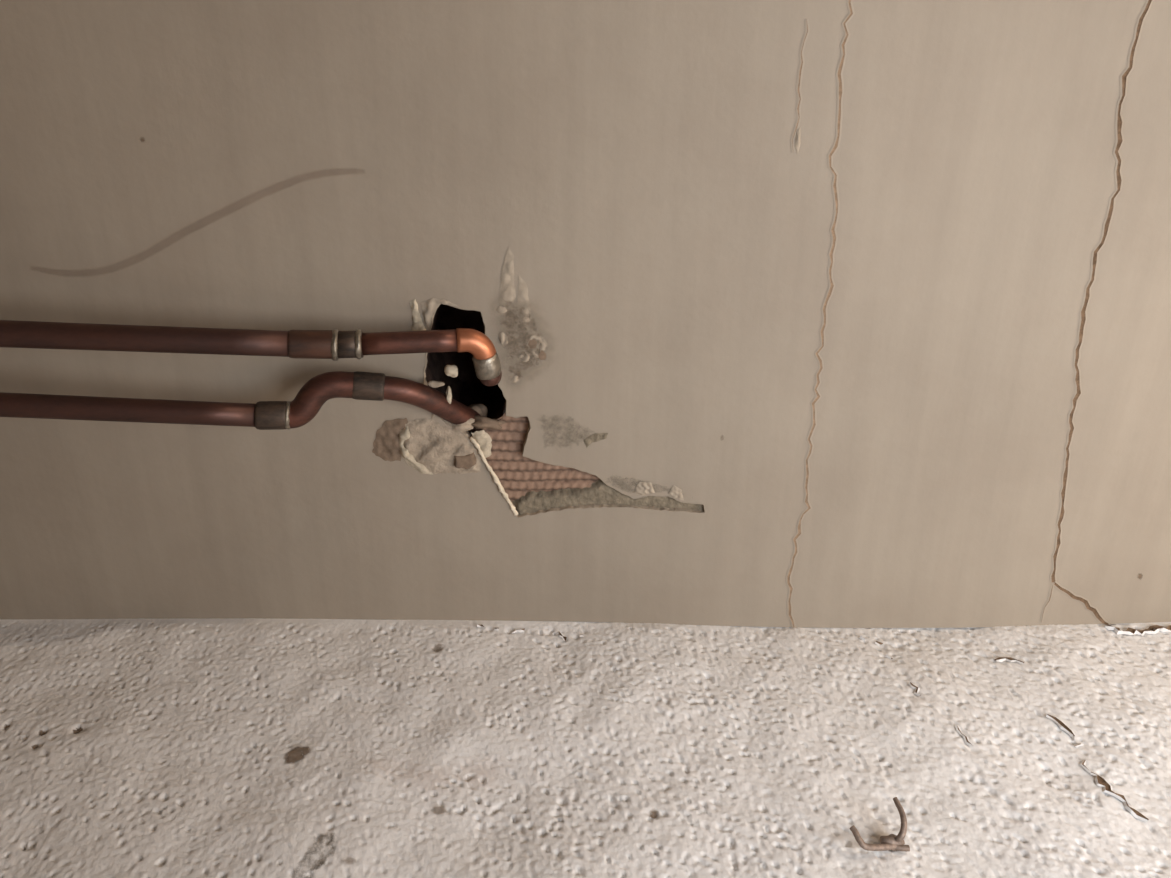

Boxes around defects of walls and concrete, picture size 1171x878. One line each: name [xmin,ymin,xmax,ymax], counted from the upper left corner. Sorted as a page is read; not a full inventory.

spalling [410,247,705,518]
crack [786,0,855,628]
crack [1040,0,1171,636]